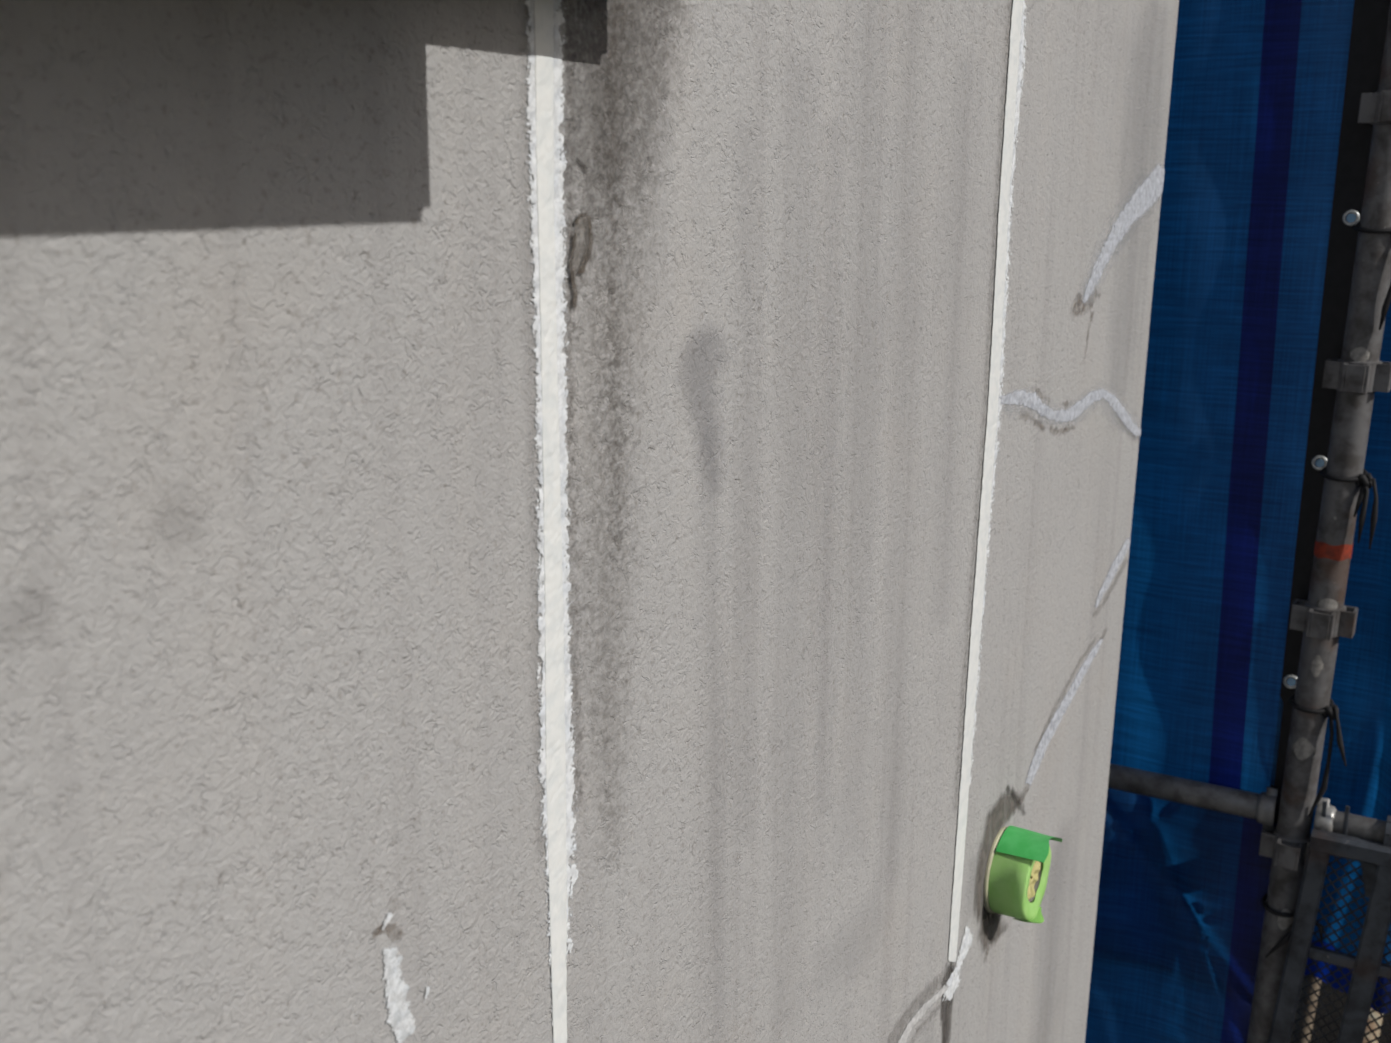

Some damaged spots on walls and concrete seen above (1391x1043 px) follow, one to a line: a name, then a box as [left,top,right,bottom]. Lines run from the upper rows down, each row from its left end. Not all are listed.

crack [1083,164,1165,304]
crack [999,389,1141,437]
crack [1025,539,1131,785]
crack [898,926,973,1043]